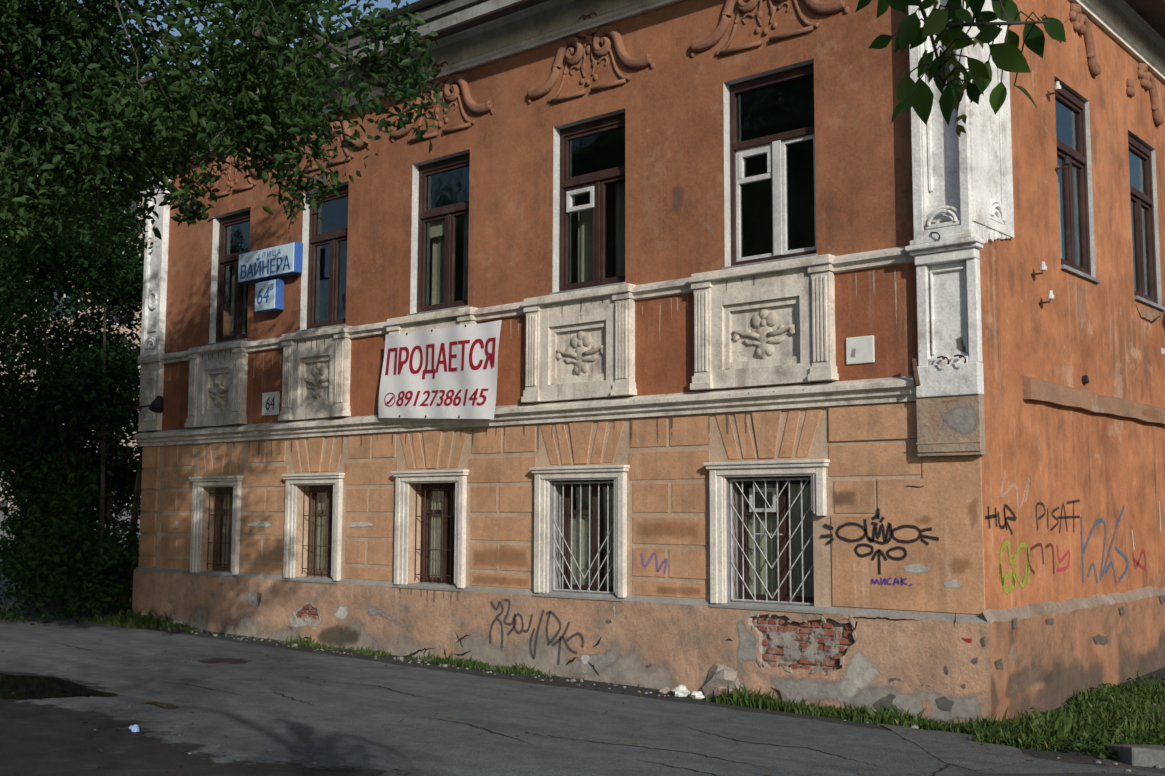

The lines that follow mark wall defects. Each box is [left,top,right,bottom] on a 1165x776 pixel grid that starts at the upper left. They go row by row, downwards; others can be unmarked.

peeling [222,593,321,642]
peeling [330,605,438,659]
spalling [748,613,980,721]